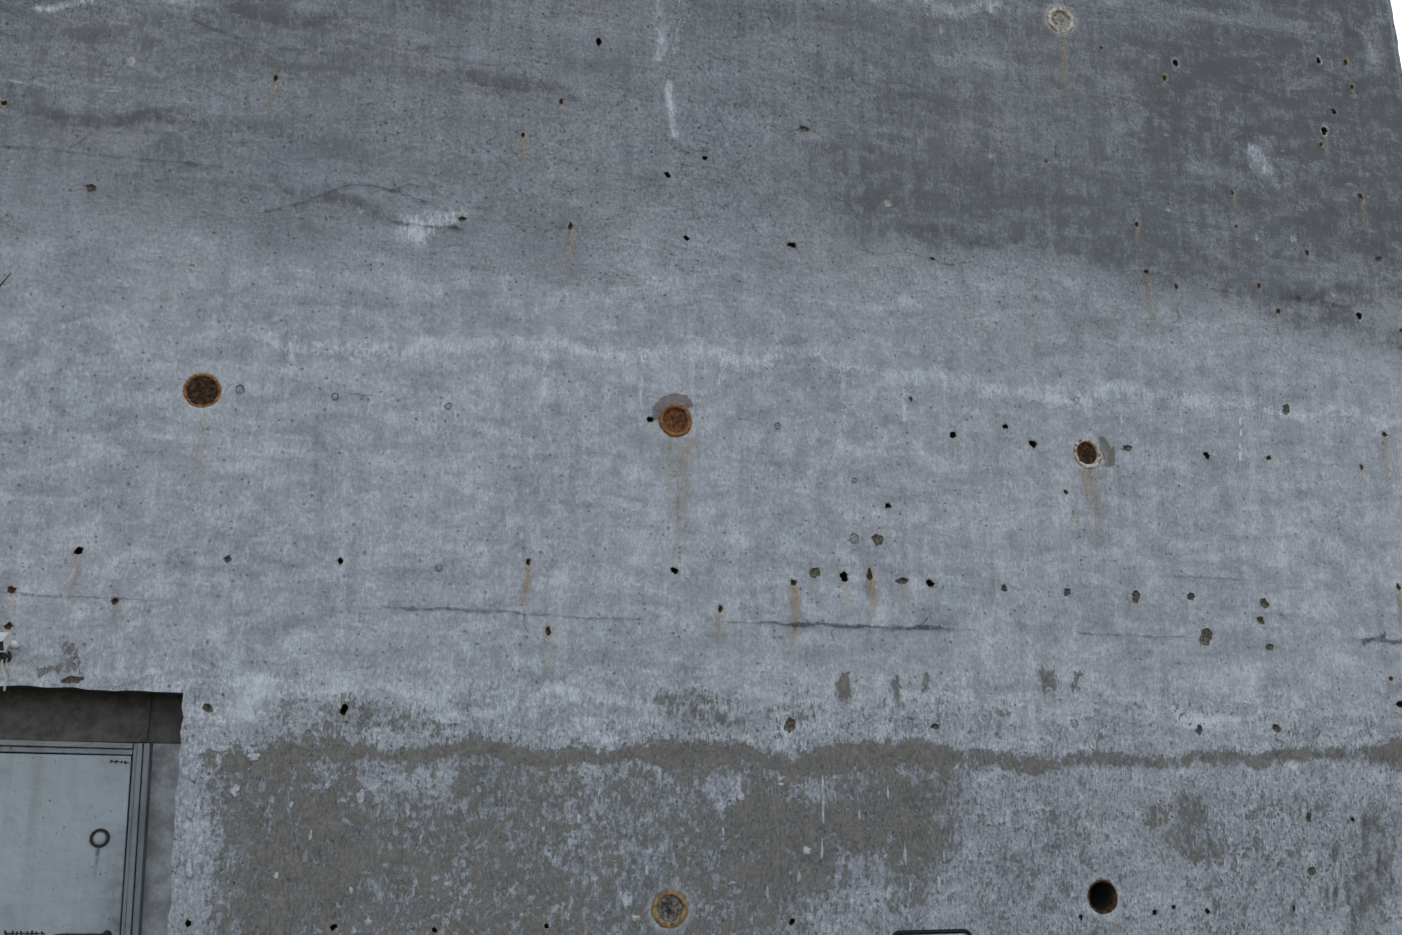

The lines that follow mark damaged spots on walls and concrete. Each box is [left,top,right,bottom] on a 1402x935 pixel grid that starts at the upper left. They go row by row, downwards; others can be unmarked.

rust [790,579,798,619]
rust [866,565,875,596]
leakage [1325,849,1394,933]